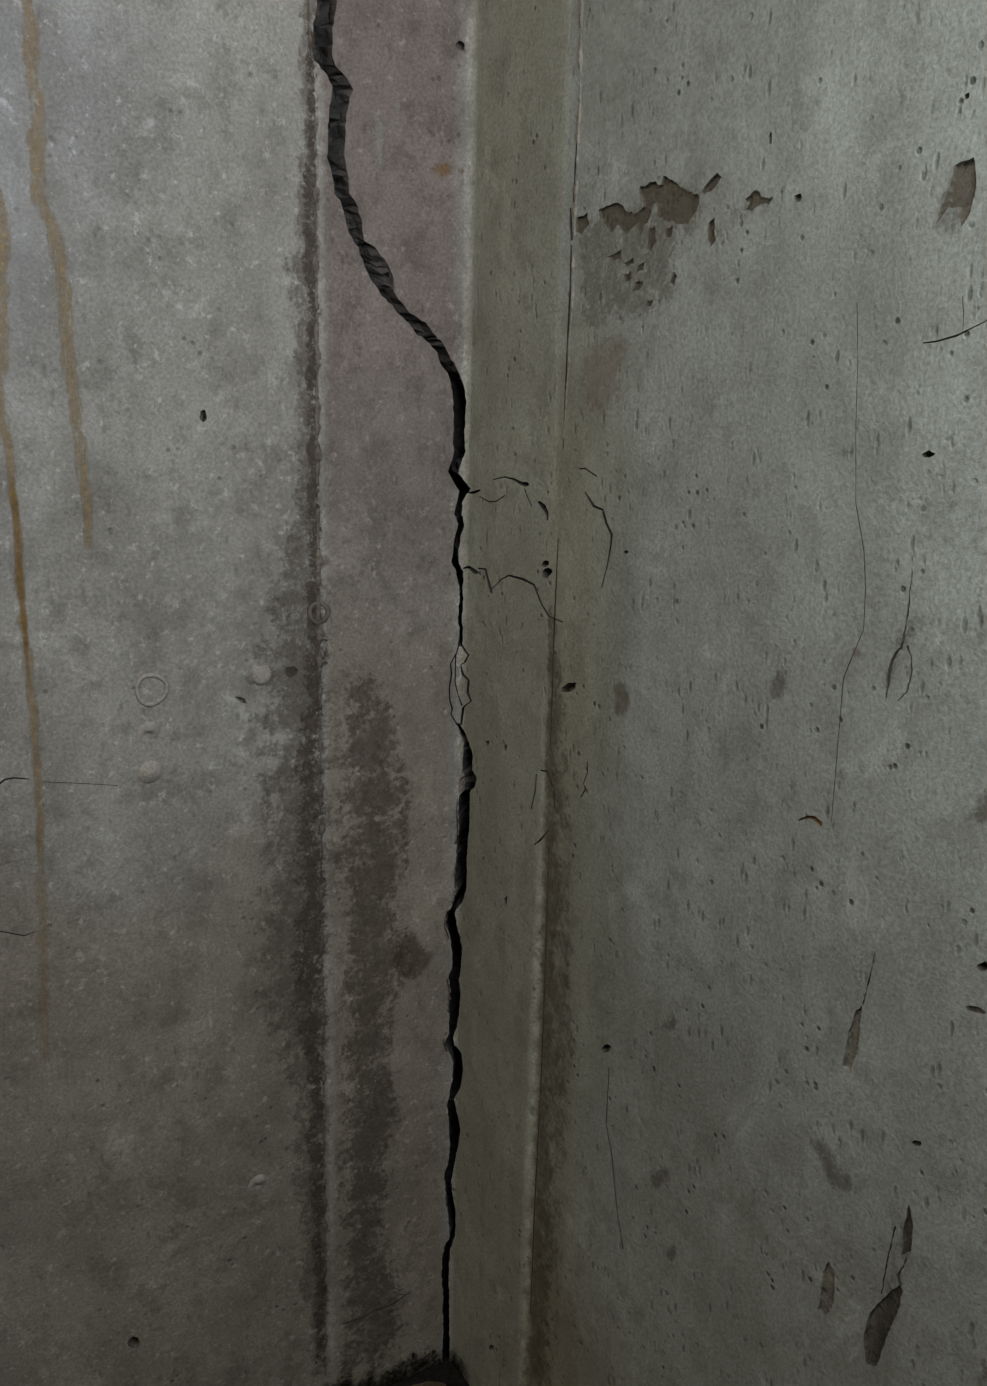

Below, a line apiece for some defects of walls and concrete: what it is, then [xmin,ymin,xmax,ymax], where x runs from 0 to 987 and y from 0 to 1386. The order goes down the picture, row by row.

corrosion [23,1,92,545]
spalling [575,173,721,307]
spalling [937,157,976,226]
corrosion [0,191,44,855]
crack [579,468,613,588]
crack [312,0,563,1386]
crack [0,777,118,786]
crack [530,762,588,845]
crack [606,1067,624,1250]
spalling [863,1206,913,1366]